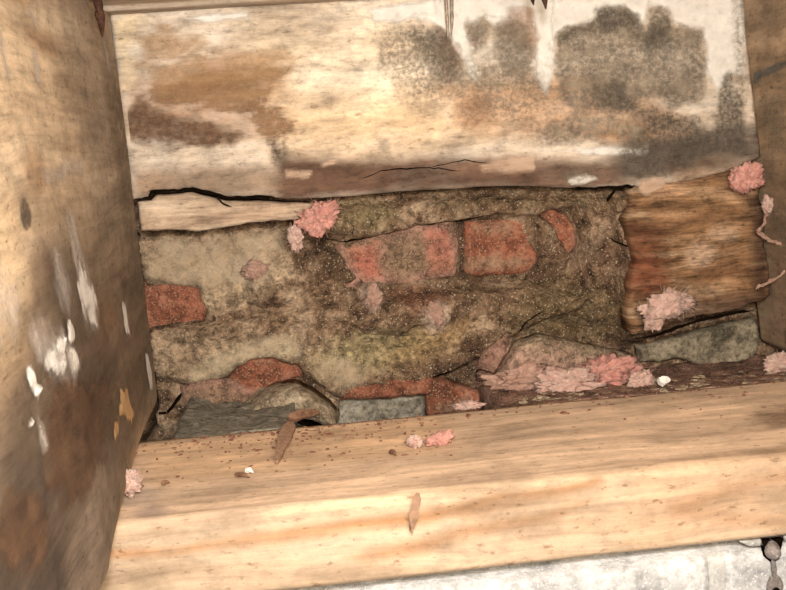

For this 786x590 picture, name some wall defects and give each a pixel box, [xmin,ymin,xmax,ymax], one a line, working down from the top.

mould [382,28,457,97]
mould [468,21,541,125]
water stain [539,6,745,174]
water stain [108,55,295,263]
crack [135,187,284,207]